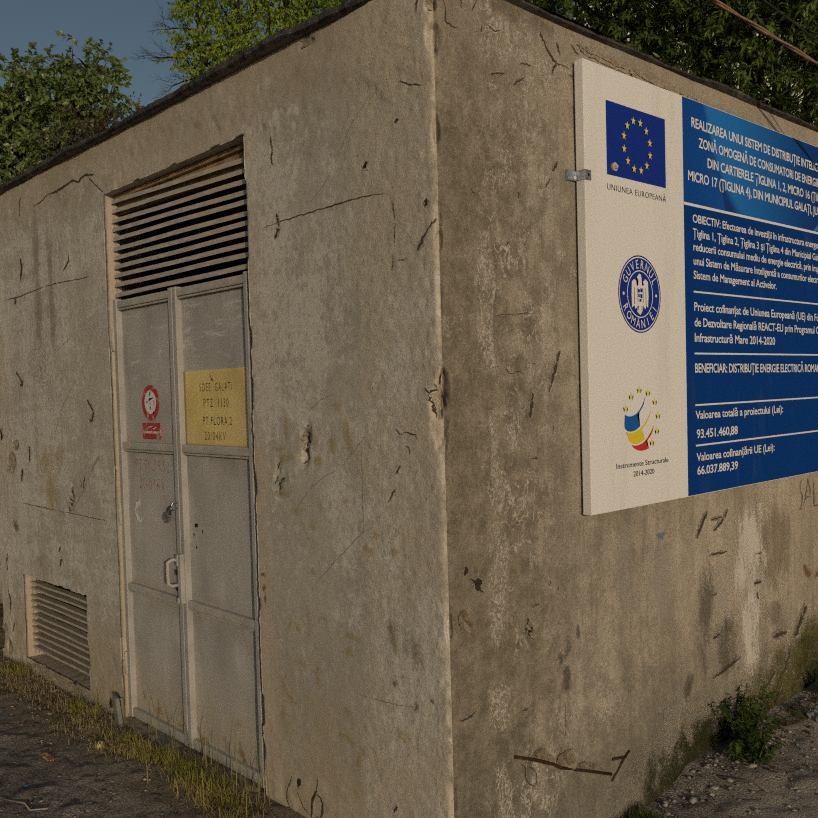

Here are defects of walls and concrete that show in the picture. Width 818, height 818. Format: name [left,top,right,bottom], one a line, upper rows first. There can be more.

crack [19,173,102,216]
crack [264,173,408,271]
crack [7,254,88,300]
spalling [425,372,443,420]
hole [301,424,312,464]
crack [24,503,105,521]
crack [298,435,370,583]
leakage [732,500,818,718]
corrosion [514,750,630,782]
leakage [635,709,744,809]